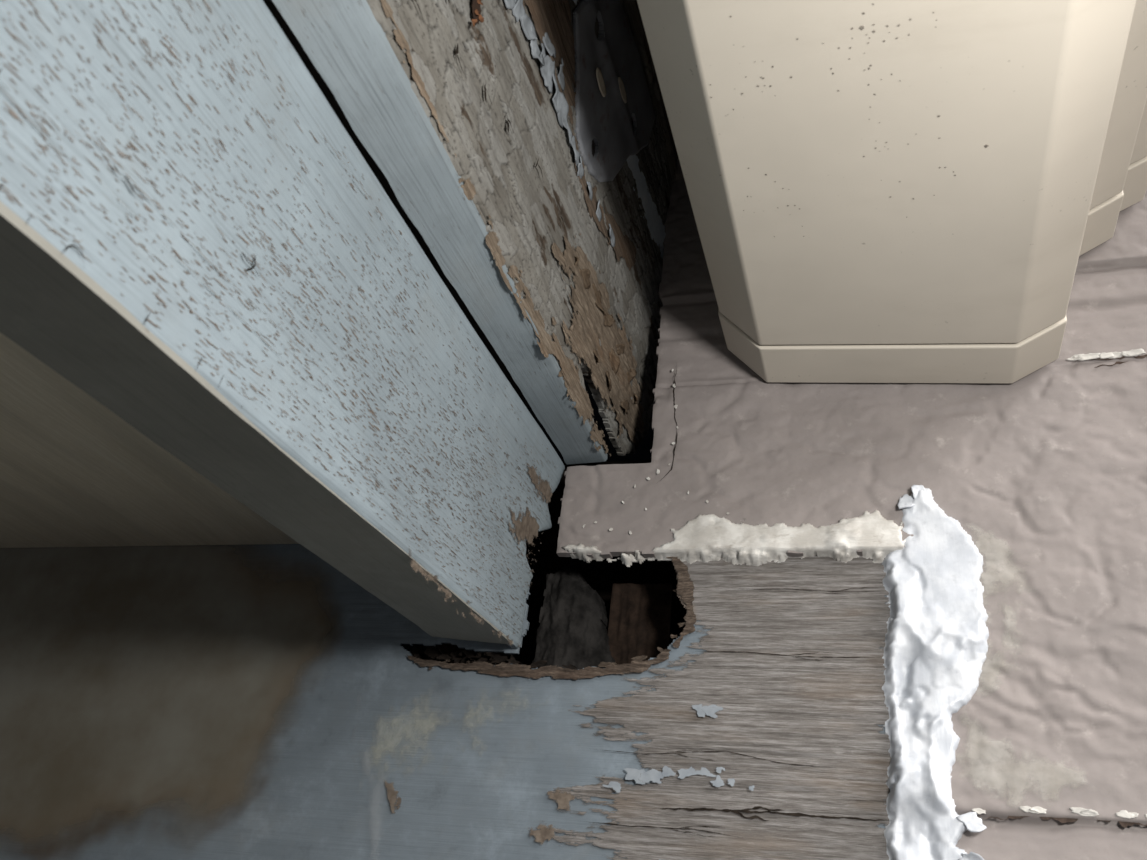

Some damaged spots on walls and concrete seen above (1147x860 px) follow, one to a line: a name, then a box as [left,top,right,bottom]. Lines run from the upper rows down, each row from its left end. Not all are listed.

peeling [504,0,636,270]
peeling [509,507,539,545]
peeling [528,466,552,503]
water stain [0,545,335,844]
peeling [530,555,891,860]